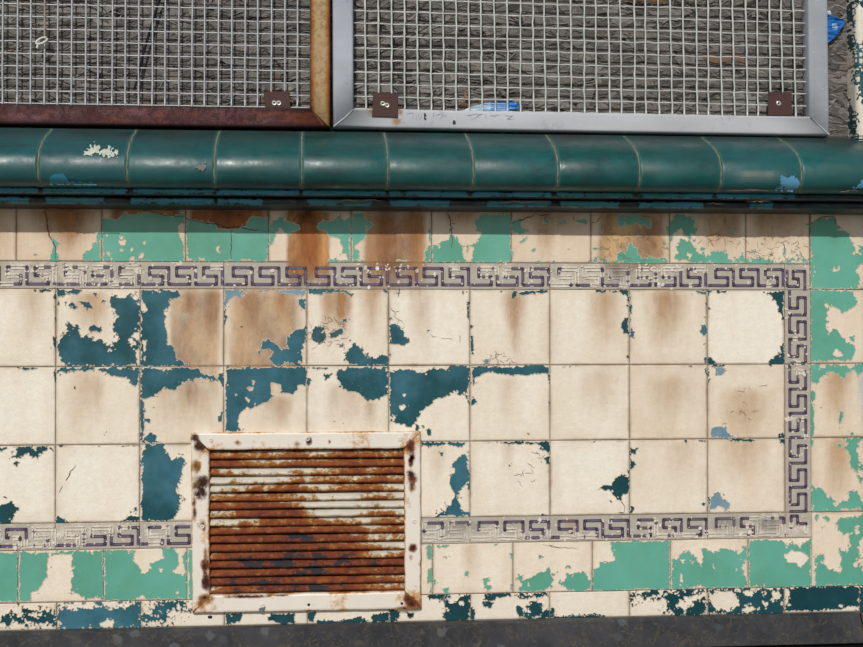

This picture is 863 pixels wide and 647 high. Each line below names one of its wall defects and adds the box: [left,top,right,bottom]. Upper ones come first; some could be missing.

peeling [846,0,863,143]
peeling [84,141,118,160]
corrosion [288,211,329,283]
corrosion [366,216,424,281]
peeling [0,174,863,630]
corrosion [191,434,208,531]
corrosion [406,439,416,491]
corrosion [198,550,214,607]
corrosion [397,595,418,610]